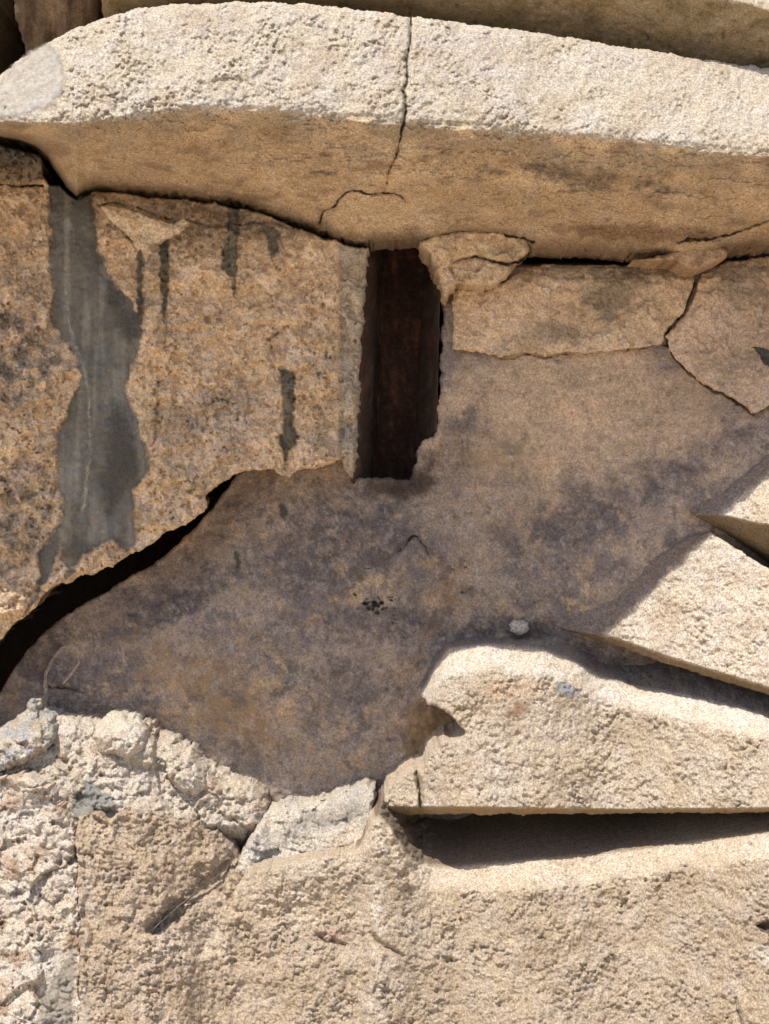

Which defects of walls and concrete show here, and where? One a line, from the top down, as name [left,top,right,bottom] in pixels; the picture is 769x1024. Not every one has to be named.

crack [306,12,412,234]
water stain [159,239,170,318]
water stain [221,206,239,295]
water stain [260,222,279,257]
water stain [26,182,150,611]
water stain [279,369,299,470]
crack [662,283,753,415]
spalling [0,767,81,1024]